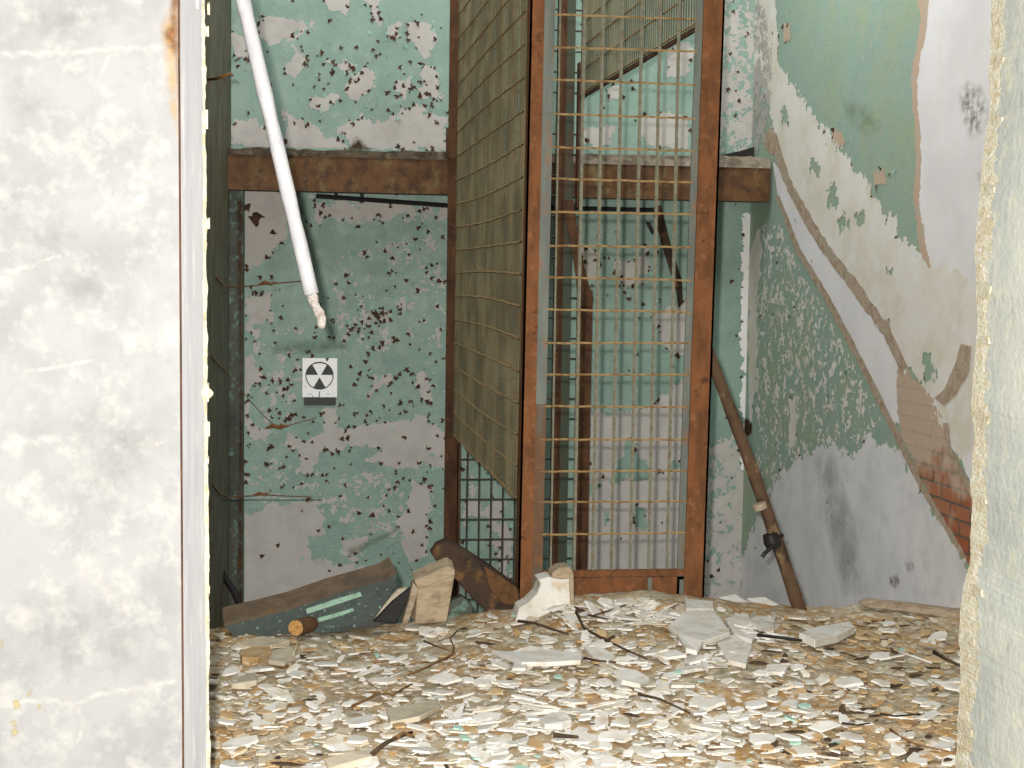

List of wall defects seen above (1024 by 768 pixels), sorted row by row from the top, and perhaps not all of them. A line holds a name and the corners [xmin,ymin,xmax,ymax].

peeling [231,31,249,68]
peeling [231,111,269,147]
peeling [256,0,449,152]
peeling [244,191,447,602]
peeling [704,0,1007,768]
peeling [460,455,513,578]